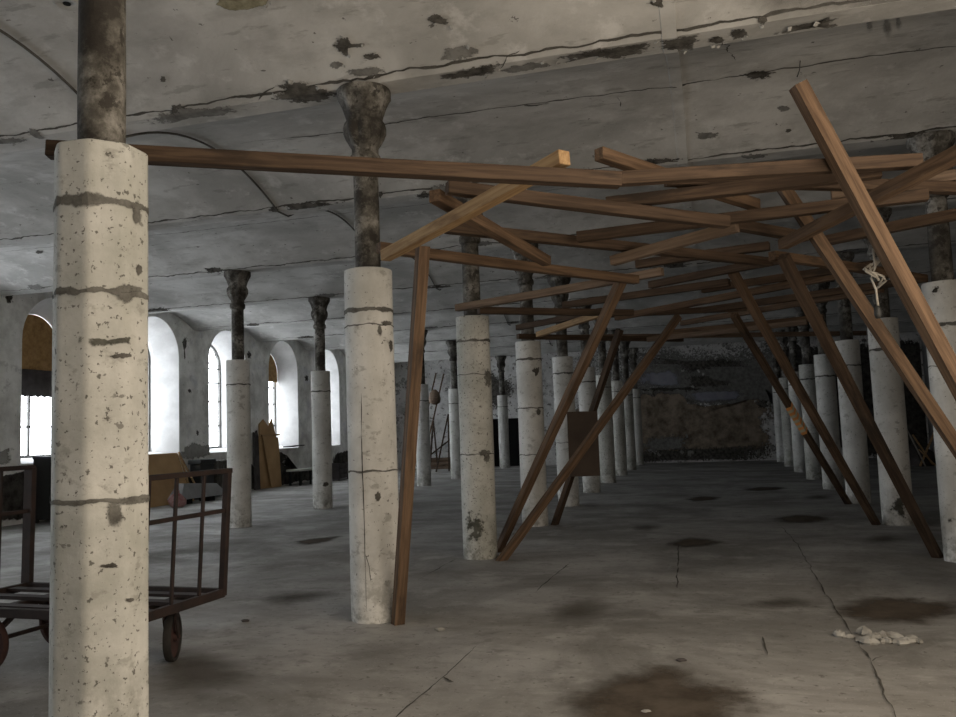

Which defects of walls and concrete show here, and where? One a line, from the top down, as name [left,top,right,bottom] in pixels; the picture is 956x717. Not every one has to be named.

peeling [217,0,271,11]
peeling [441,29,749,79]
crack [310,0,956,125]
crack [126,87,284,116]
crack [0,122,77,137]
damp [778,515,827,523]
crack [783,528,896,717]
damp [840,598,955,622]
crack [396,645,477,717]
damp [572,667,749,717]